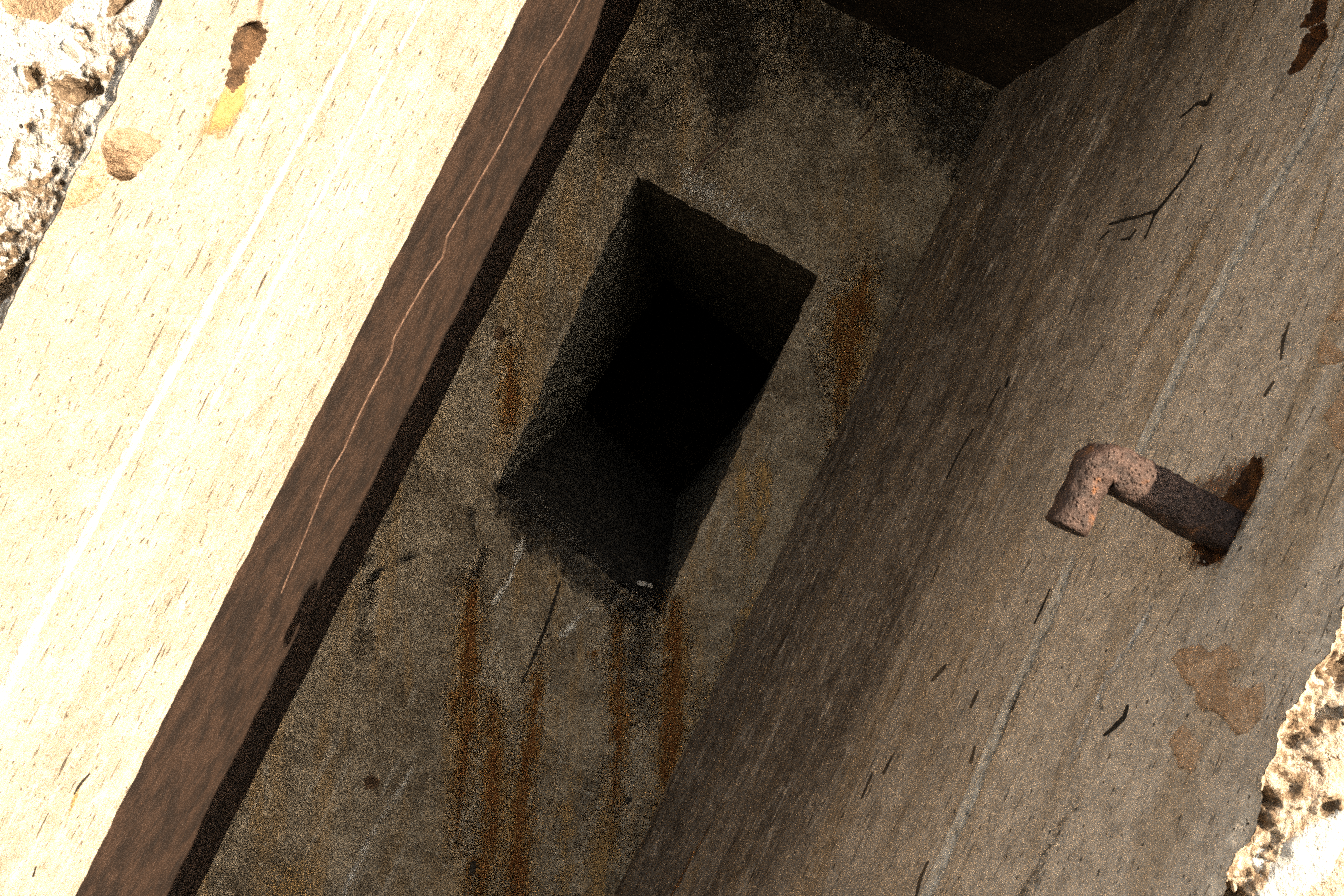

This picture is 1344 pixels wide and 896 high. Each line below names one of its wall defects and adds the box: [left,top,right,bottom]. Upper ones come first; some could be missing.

spalling [0,0,153,330]
spalling [225,20,269,93]
crack [1099,144,1202,241]
crack [1179,93,1213,118]
spalling [1287,0,1328,75]
crack [280,0,580,594]
rust [828,271,874,415]
rust [446,586,545,896]
crack [522,581,561,683]
rust [586,618,631,803]
rust [656,602,688,791]
spalling [1226,607,1344,896]